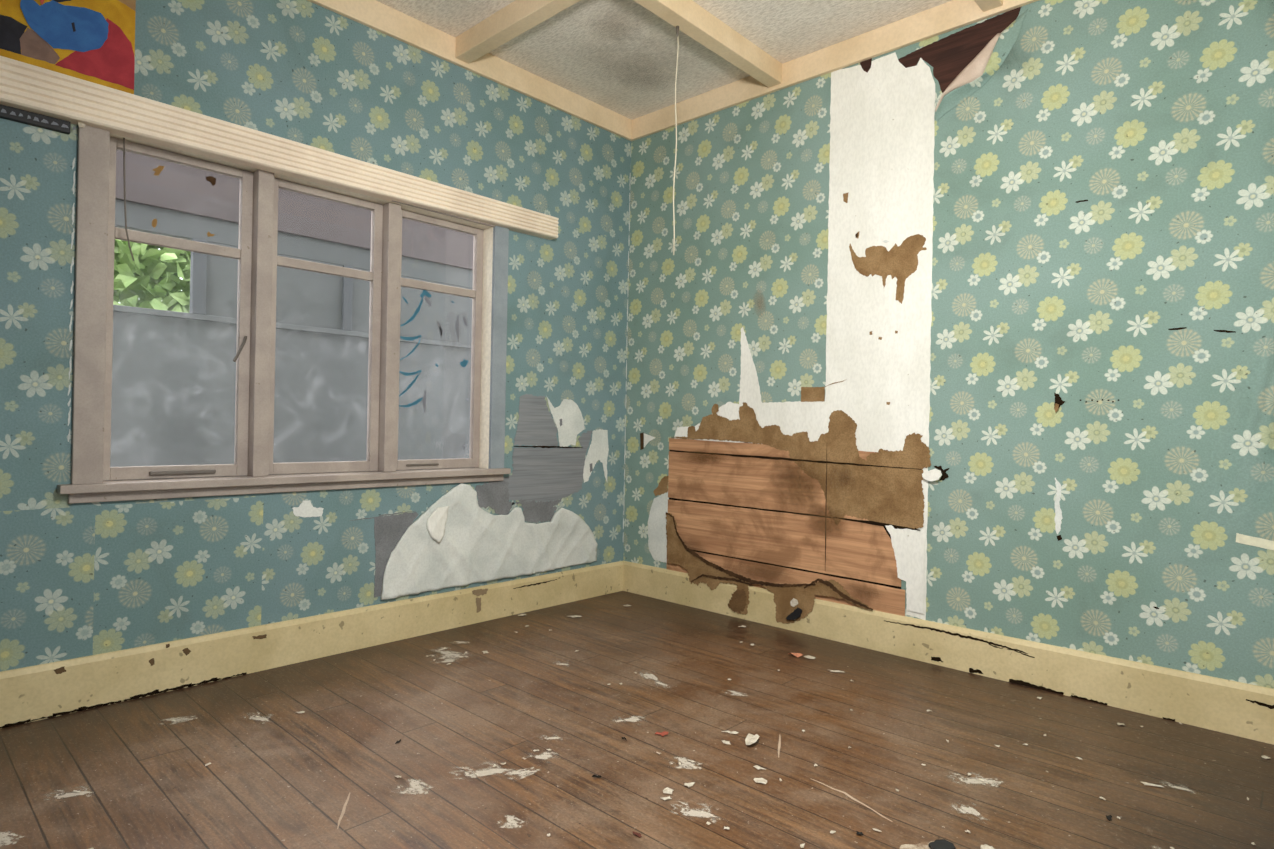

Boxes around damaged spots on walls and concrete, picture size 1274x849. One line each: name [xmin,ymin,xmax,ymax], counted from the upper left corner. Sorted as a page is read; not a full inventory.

peeling [717,52,935,452]
peeling [475,394,609,523]
peeling [674,423,759,444]
peeling [906,467,928,620]
crack [1246,699,1274,709]